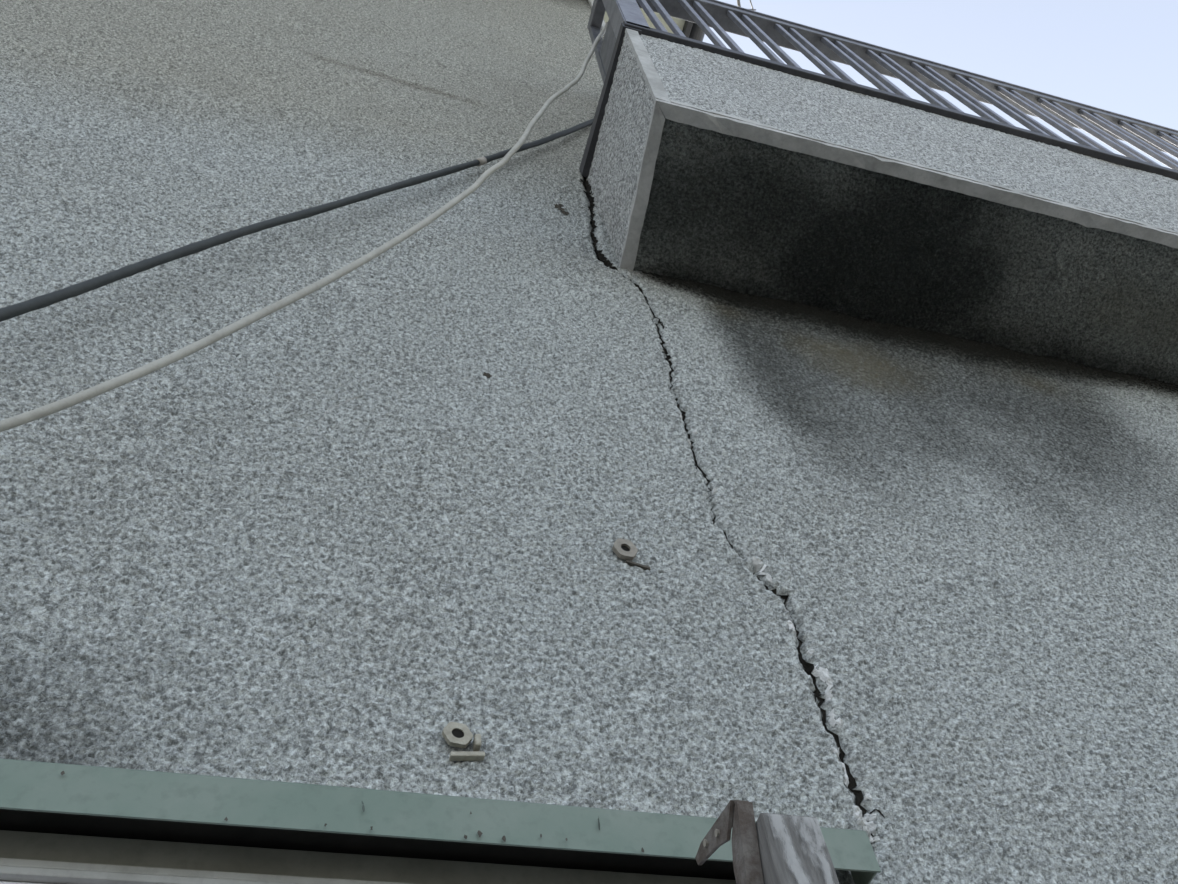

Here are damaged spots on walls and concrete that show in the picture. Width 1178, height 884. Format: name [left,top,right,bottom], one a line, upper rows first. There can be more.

crack [580,177,885,844]